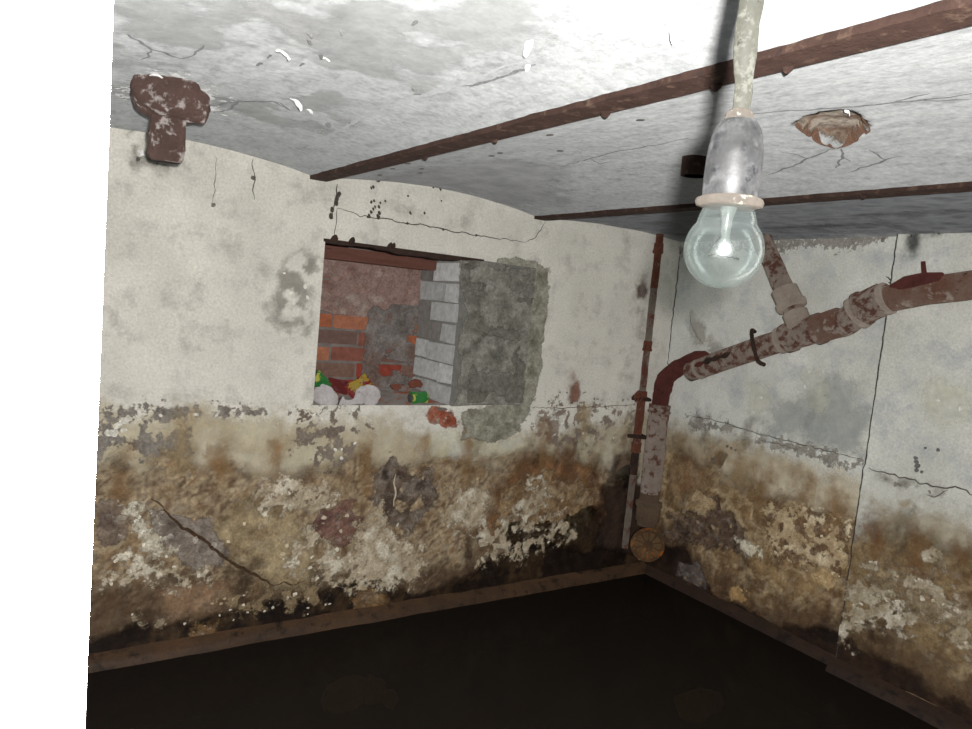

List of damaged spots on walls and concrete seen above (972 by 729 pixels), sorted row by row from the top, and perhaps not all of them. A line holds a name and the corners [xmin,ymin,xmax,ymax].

spalling [793,110,872,149]
crack [329,184,543,243]
crack [886,234,898,284]
peeling [96,399,268,477]
peeling [288,404,375,479]
spalling [426,406,457,428]
peeling [685,411,865,471]
crack [692,316,972,658]
crack [151,498,306,586]
damp [88,409,972,722]